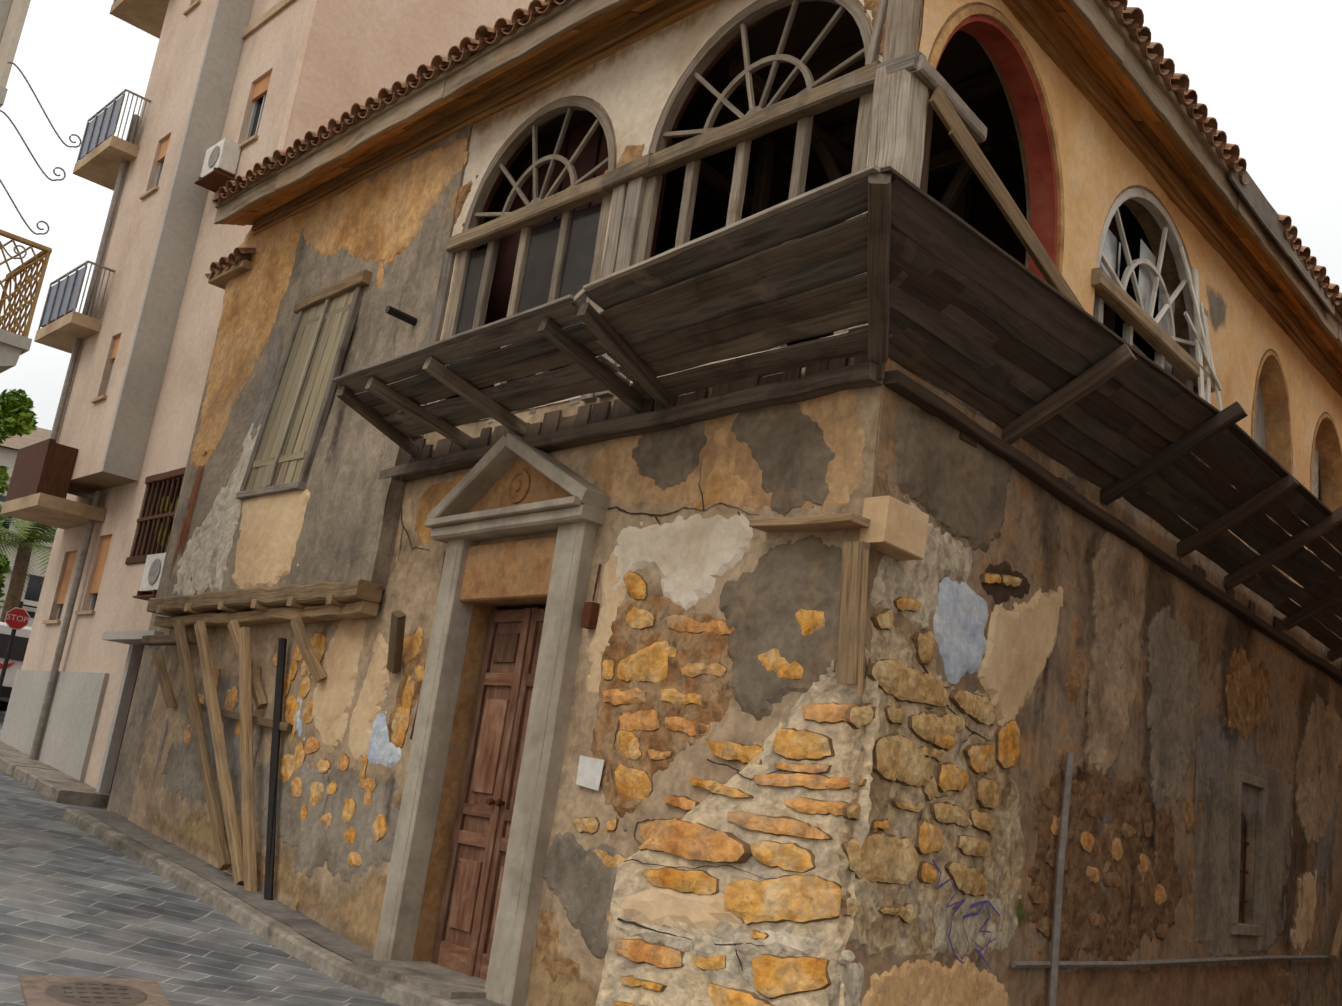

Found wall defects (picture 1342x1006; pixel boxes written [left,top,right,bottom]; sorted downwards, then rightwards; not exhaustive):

peeling [190,138,478,469]
peeling [172,423,311,596]
peeling [415,473,467,547]
crack [608,455,758,526]
peeling [798,389,865,515]
spalling [586,412,773,832]
spalling [173,669,254,745]
peeling [257,618,426,867]
spalling [827,407,1292,1006]
peeling [620,883,746,930]
peeling [1289,869,1317,955]